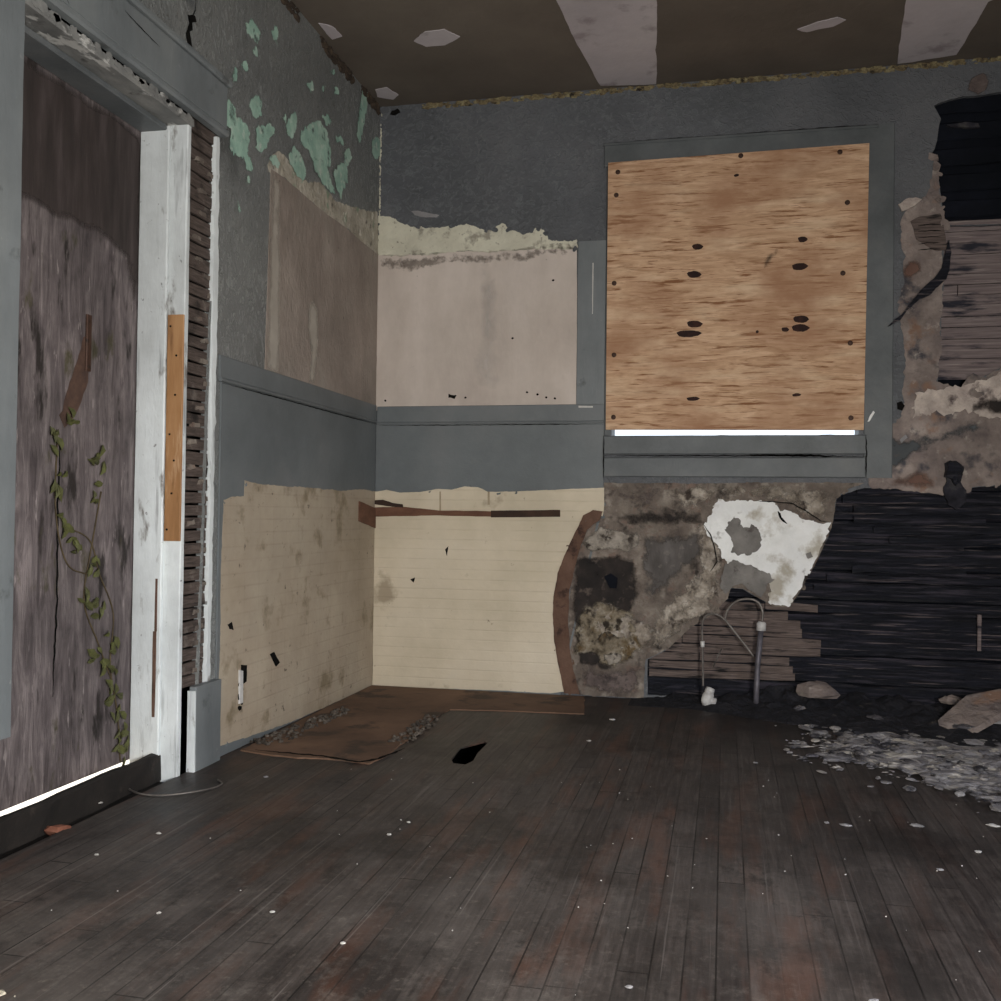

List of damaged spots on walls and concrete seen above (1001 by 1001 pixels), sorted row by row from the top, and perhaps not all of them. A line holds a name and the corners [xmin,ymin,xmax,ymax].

crack [186,1,197,46]
peeling [232,18,279,82]
spalling [422,56,1001,110]
flaking render [227,36,578,411]
peeling [219,94,1001,746]